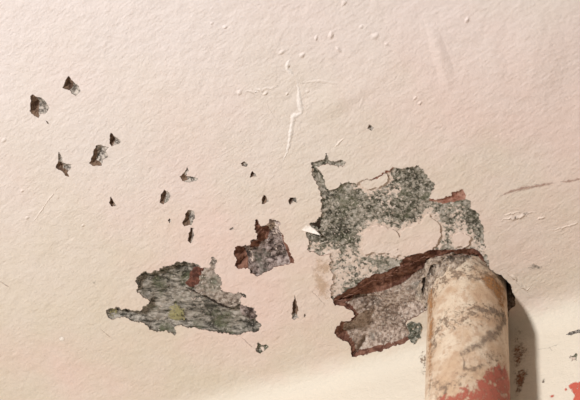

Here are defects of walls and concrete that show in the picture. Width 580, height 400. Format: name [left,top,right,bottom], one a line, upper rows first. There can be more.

spalling [63,76,80,96]
spalling [30,94,49,118]
spalling [56,152,71,177]
spalling [89,133,121,166]
spalling [160,190,170,204]
spalling [182,210,195,243]
spalling [234,219,294,277]
peeling [302,153,490,357]
flaking render [106,257,262,336]
spalling [291,295,306,320]
spalling [507,283,516,317]